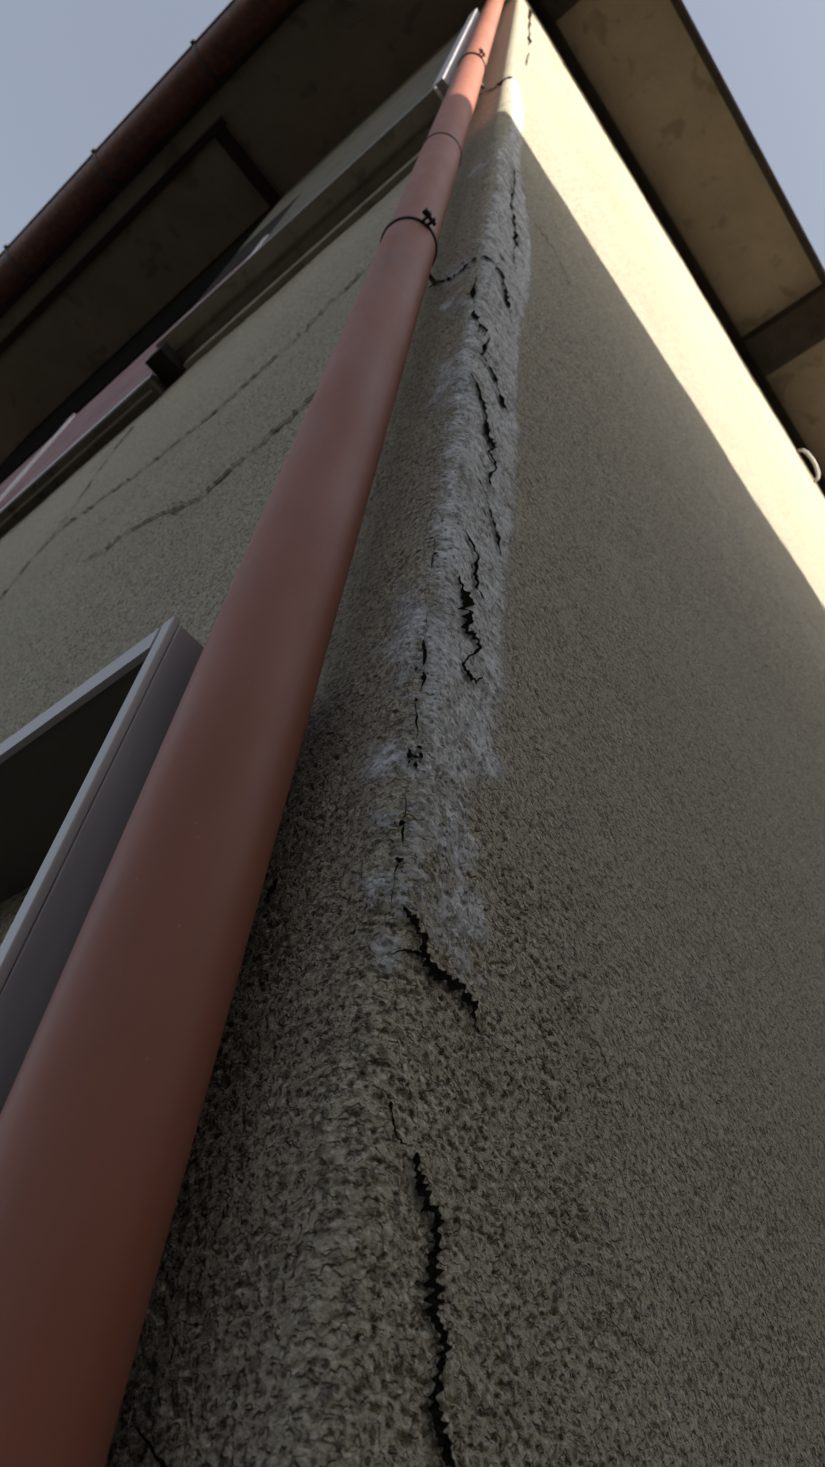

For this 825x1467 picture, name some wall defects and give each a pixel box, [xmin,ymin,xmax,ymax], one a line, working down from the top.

crack [0,264,371,598]
crack [391,169,569,1033]
crack [131,1425,166,1467]
crack [388,1101,456,1467]